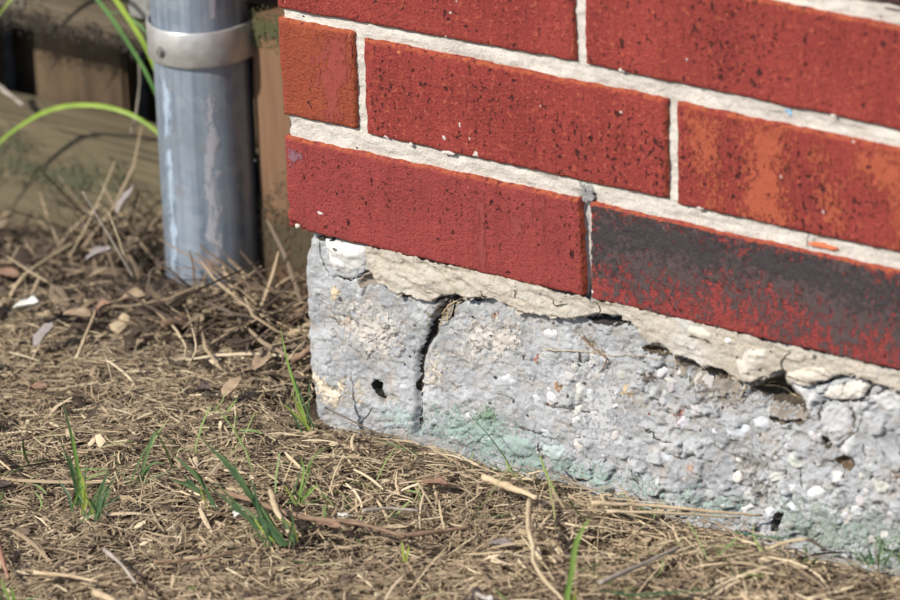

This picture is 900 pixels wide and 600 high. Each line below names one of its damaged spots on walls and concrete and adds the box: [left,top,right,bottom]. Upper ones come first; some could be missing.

crack [416,292,490,429]
spalling [588,313,640,326]
spalling [642,345,900,541]
crack [813,375,890,481]